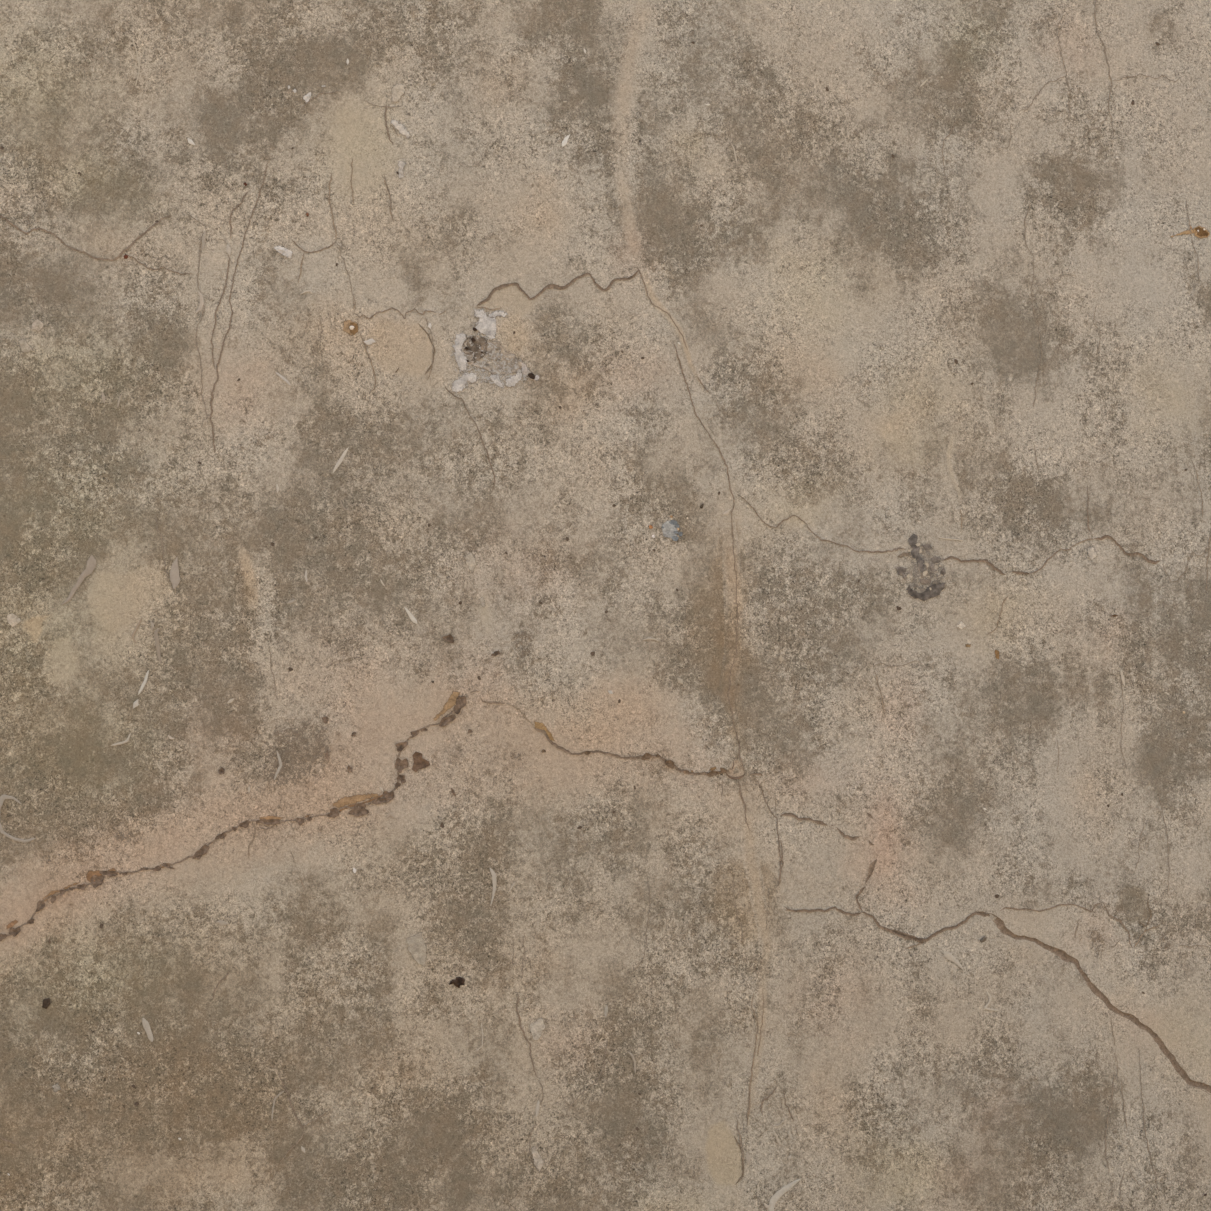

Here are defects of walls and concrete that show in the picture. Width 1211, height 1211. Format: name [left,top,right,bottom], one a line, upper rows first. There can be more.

crack [0,163,268,453]
peeling [364,284,542,393]
crack [1024,202,1042,405]
crack [0,267,1211,1211]